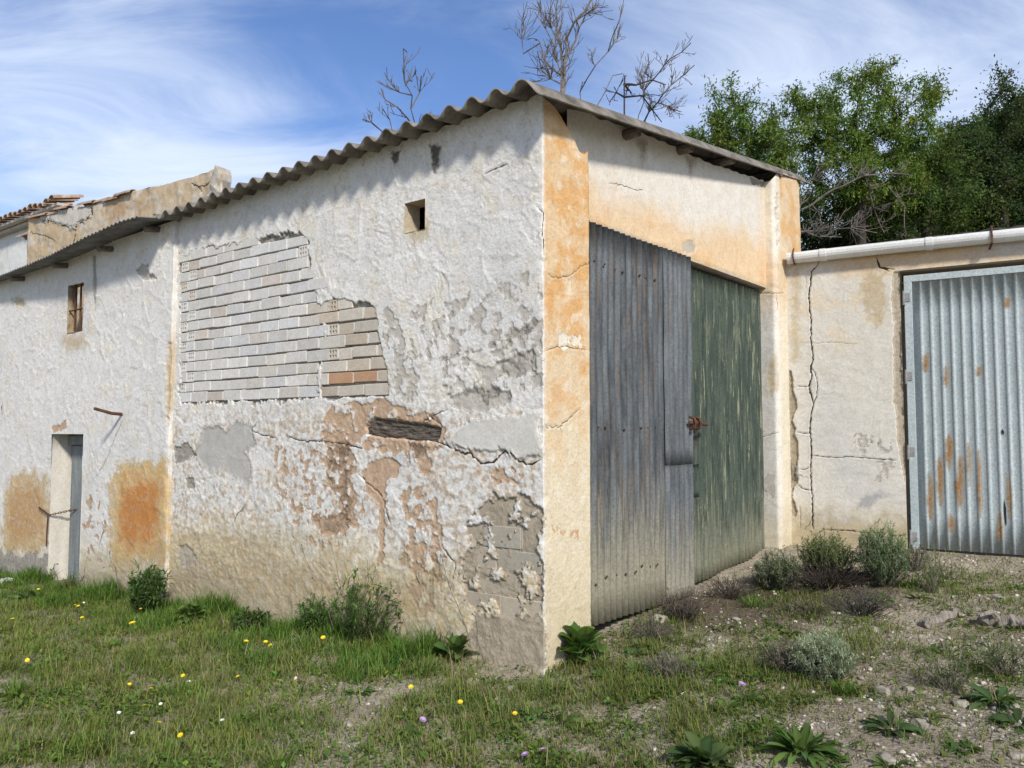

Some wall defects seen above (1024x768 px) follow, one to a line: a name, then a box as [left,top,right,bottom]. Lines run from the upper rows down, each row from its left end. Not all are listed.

flaking render [168,230,544,618]
crack [424,410,542,465]
crack [763,262,892,533]
corrosion [928,435,982,519]
corrosion [997,479,1011,536]